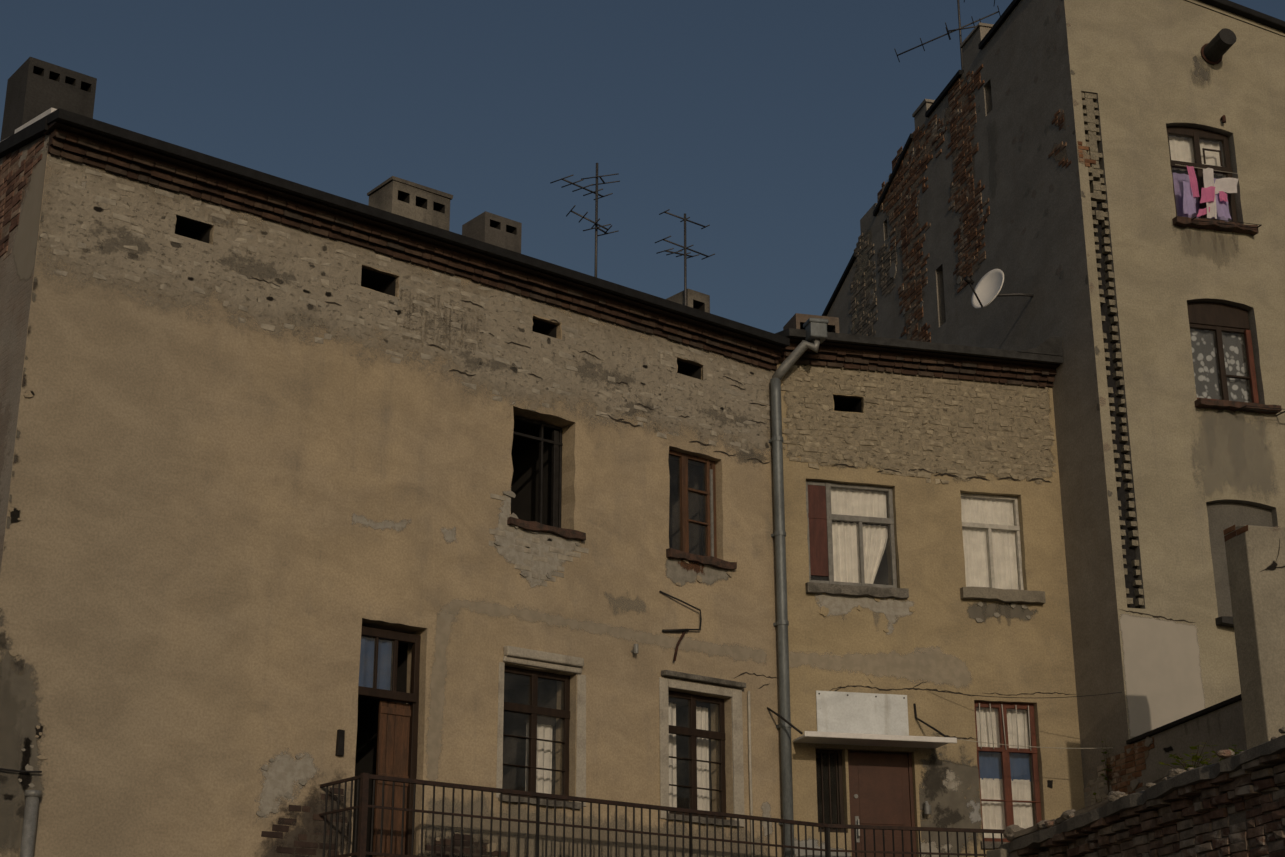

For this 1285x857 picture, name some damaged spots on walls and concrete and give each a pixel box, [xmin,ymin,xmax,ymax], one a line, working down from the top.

flaking render [849,64,990,342]
spalling [0,135,1057,484]
spalling [489,491,589,588]
spalling [665,558,733,587]
flaking render [815,593,916,635]
crack [735,672,777,689]
crack [830,679,1076,696]
leakage [0,611,47,850]
flaking render [255,751,317,818]
leakage [919,748,982,857]
flaking render [1083,736,1173,807]